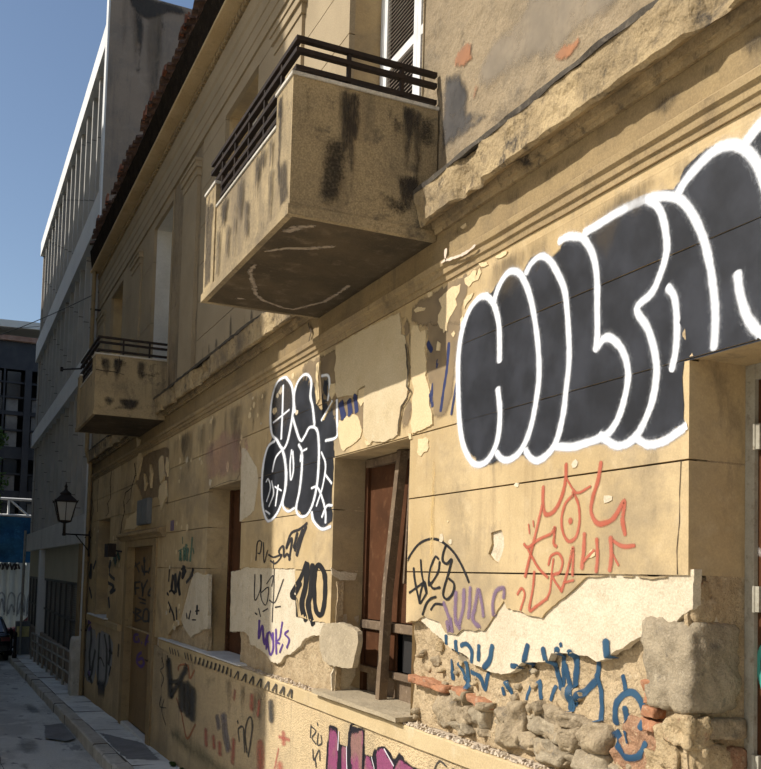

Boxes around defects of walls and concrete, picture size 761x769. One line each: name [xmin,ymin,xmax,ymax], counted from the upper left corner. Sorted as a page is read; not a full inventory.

leakage [131,0,183,49]
leakage [255,100,287,206]
leakage [321,93,359,200]
leakage [389,110,432,212]
leakage [205,179,248,284]
leakage [249,265,350,310]
spalling [441,244,475,263]
flaking render [291,251,508,456]
spalling [491,530,504,562]
spalling [166,572,213,651]
spalling [230,567,363,691]
spalling [408,569,748,769]